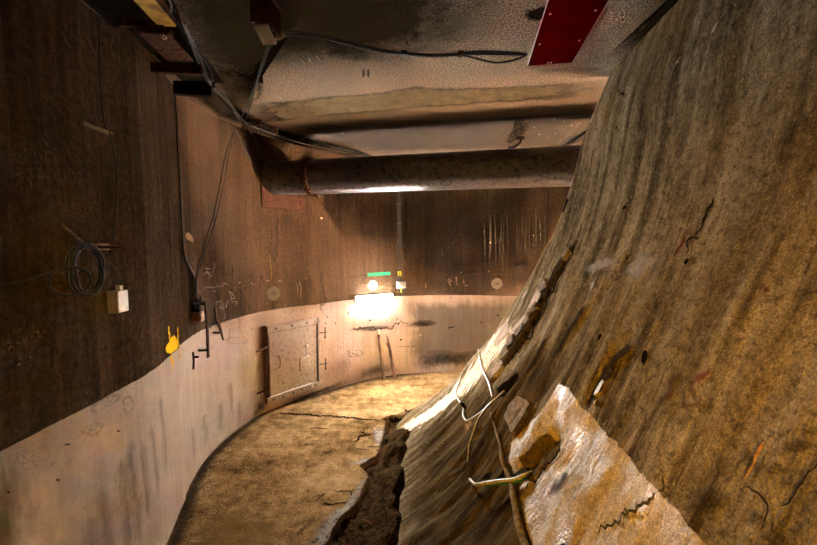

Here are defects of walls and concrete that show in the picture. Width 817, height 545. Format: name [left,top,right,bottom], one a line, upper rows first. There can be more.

crack [685,197,715,256]
crack [352,318,427,331]
spalling [491,246,575,437]
crack [277,409,410,452]
crack [598,478,665,533]